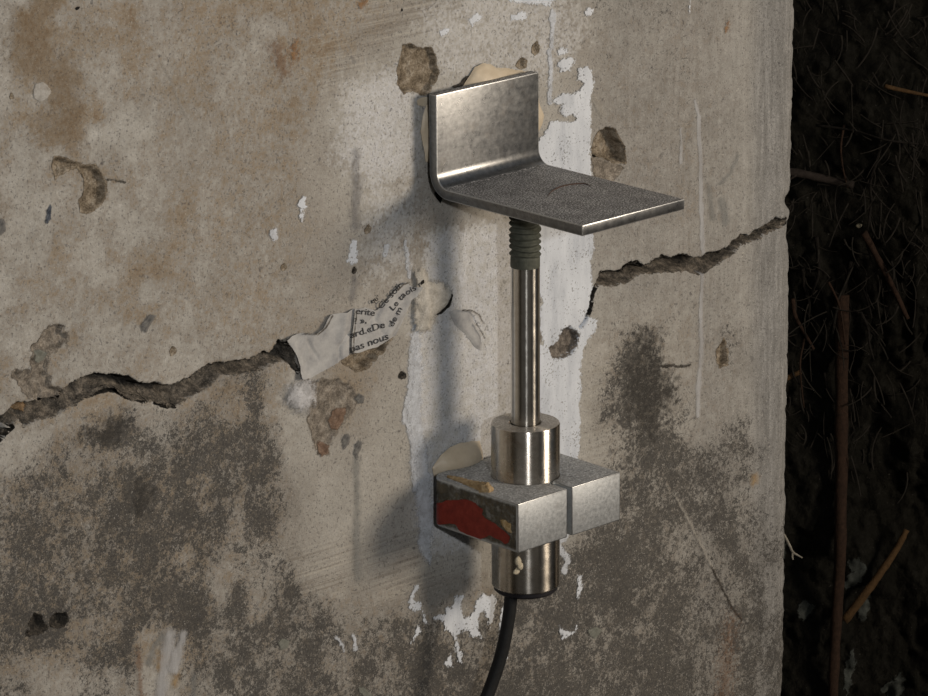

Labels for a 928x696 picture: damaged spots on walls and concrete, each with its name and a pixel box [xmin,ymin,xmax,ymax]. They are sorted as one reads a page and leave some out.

spalling [396,43,440,96]
peeling [509,0,627,181]
spalling [51,156,108,214]
efflorescence [694,100,705,254]
crack [585,204,789,319]
crack [0,339,300,442]
peeling [539,225,598,459]
crack [661,362,691,370]
efflorescence [696,272,704,417]
peeling [560,534,583,599]
efflorescence [157,631,186,696]
peeling [408,585,503,667]